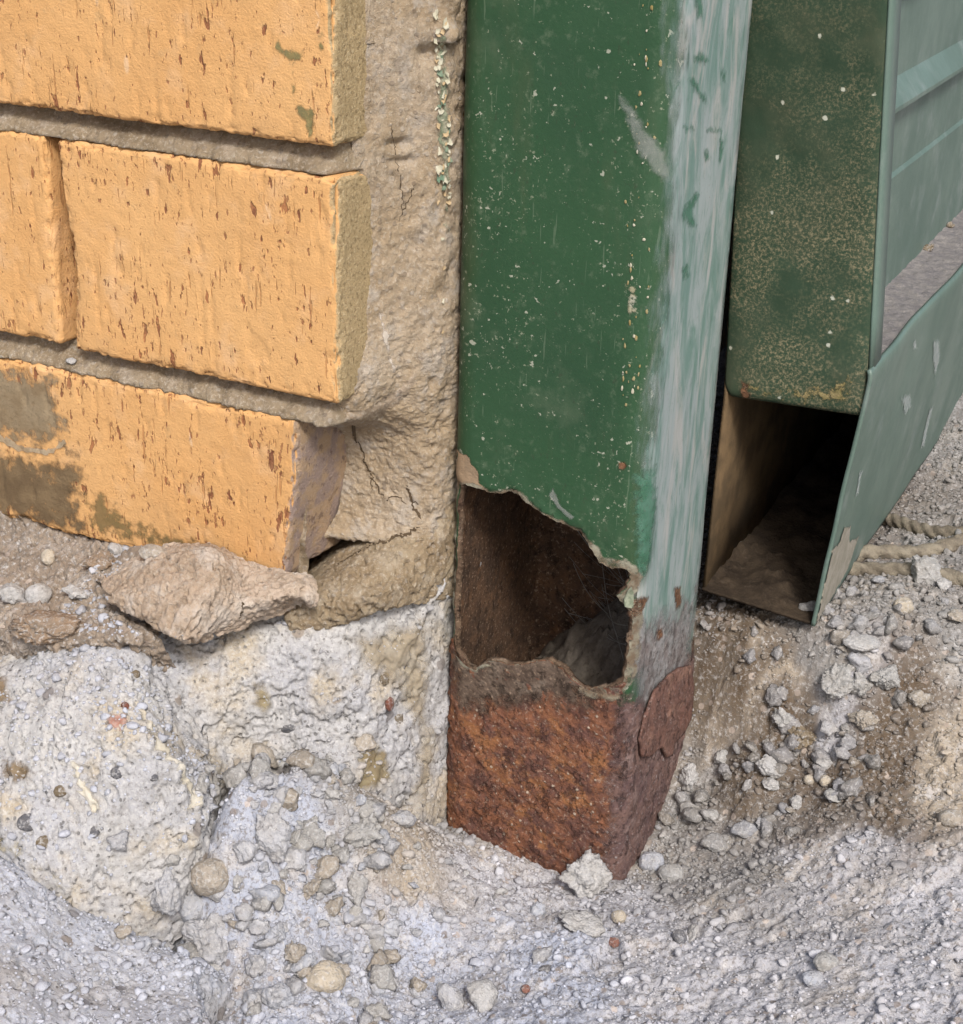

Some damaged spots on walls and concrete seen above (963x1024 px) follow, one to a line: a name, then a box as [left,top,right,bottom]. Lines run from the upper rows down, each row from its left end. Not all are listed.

peeling [433,9,453,211]
damp [0,368,194,544]
crack [337,425,422,564]
peeling [817,526,859,621]
corrosion [446,481,695,880]